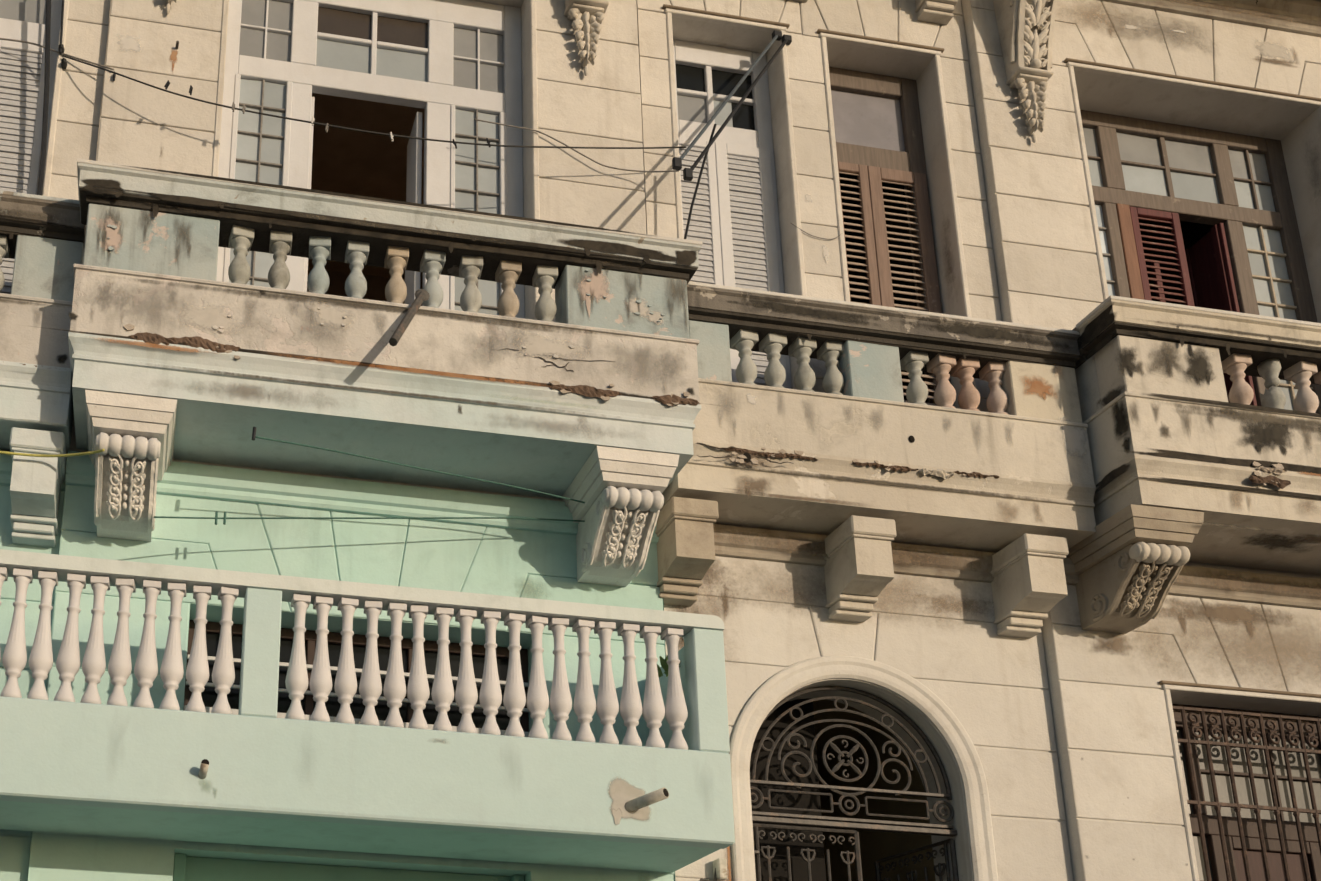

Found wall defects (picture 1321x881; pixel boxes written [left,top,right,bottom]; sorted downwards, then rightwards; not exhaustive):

peeling [105,218,122,251]
peeling [579,268,609,318]
peeling [627,299,665,324]
spalling [123,324,241,360]
spalling [549,380,621,401]
spalling [652,388,699,406]
corrosion [1025,378,1053,399]
leakage [1077,304,1321,493]
spalling [723,447,818,465]
spalling [852,459,919,472]
spalling [954,471,999,479]
spalling [1249,461,1291,489]